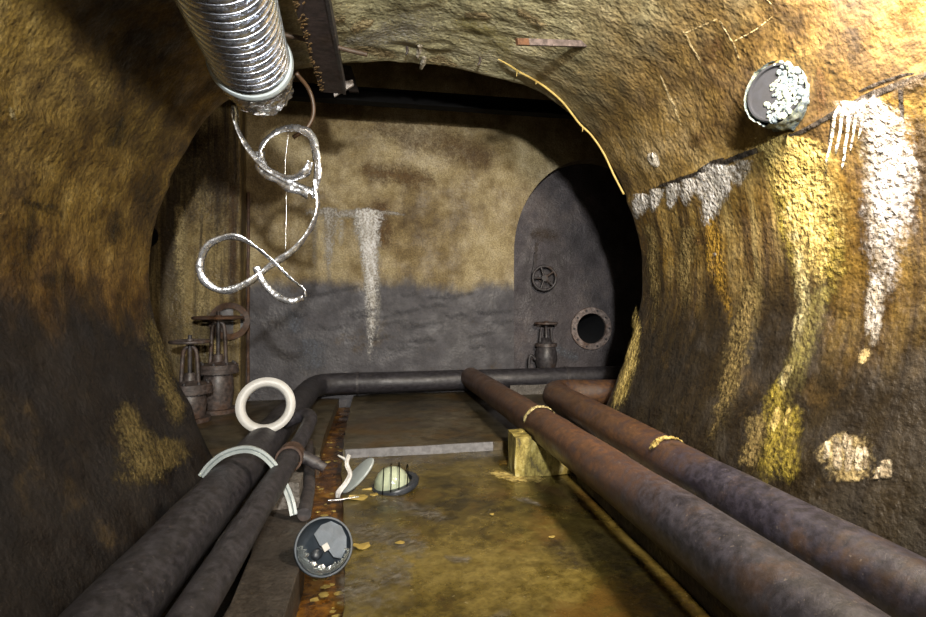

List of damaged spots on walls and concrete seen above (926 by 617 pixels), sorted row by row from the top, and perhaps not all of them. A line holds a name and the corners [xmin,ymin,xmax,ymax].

water stain [306,208,399,353]
water stain [632,160,760,434]
crack [650,146,765,190]
water stain [744,60,844,331]
crack [784,72,926,181]
water stain [841,98,918,339]
water stain [741,365,800,479]